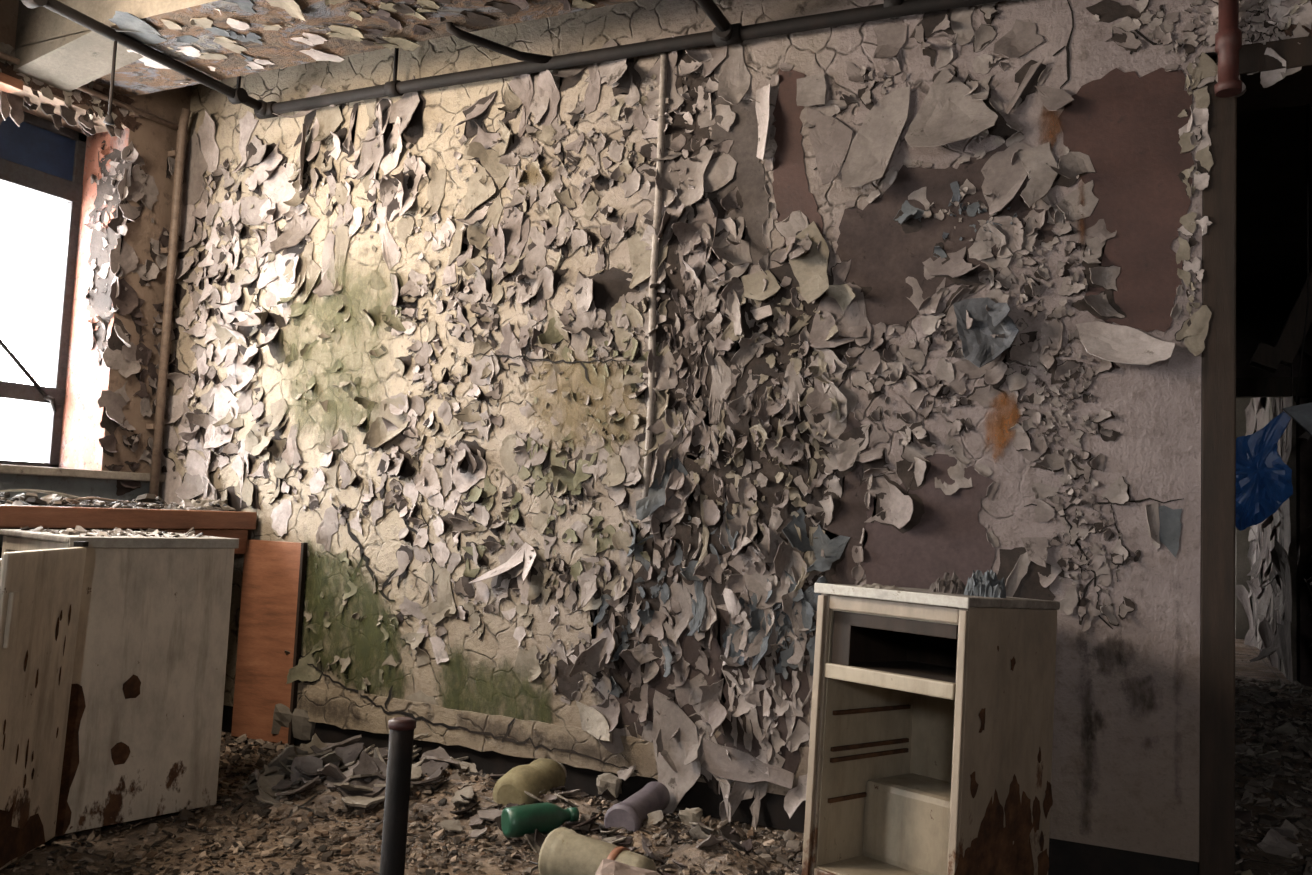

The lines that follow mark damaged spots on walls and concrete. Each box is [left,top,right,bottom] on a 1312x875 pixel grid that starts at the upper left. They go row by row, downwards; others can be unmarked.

peeling [1232,0,1312,98]
peeling [0,42,169,496]
water stain [286,270,390,427]
spalling [159,0,1218,828]
peeling [1245,364,1293,466]
water stain [302,542,404,699]
peeling [1235,498,1293,683]